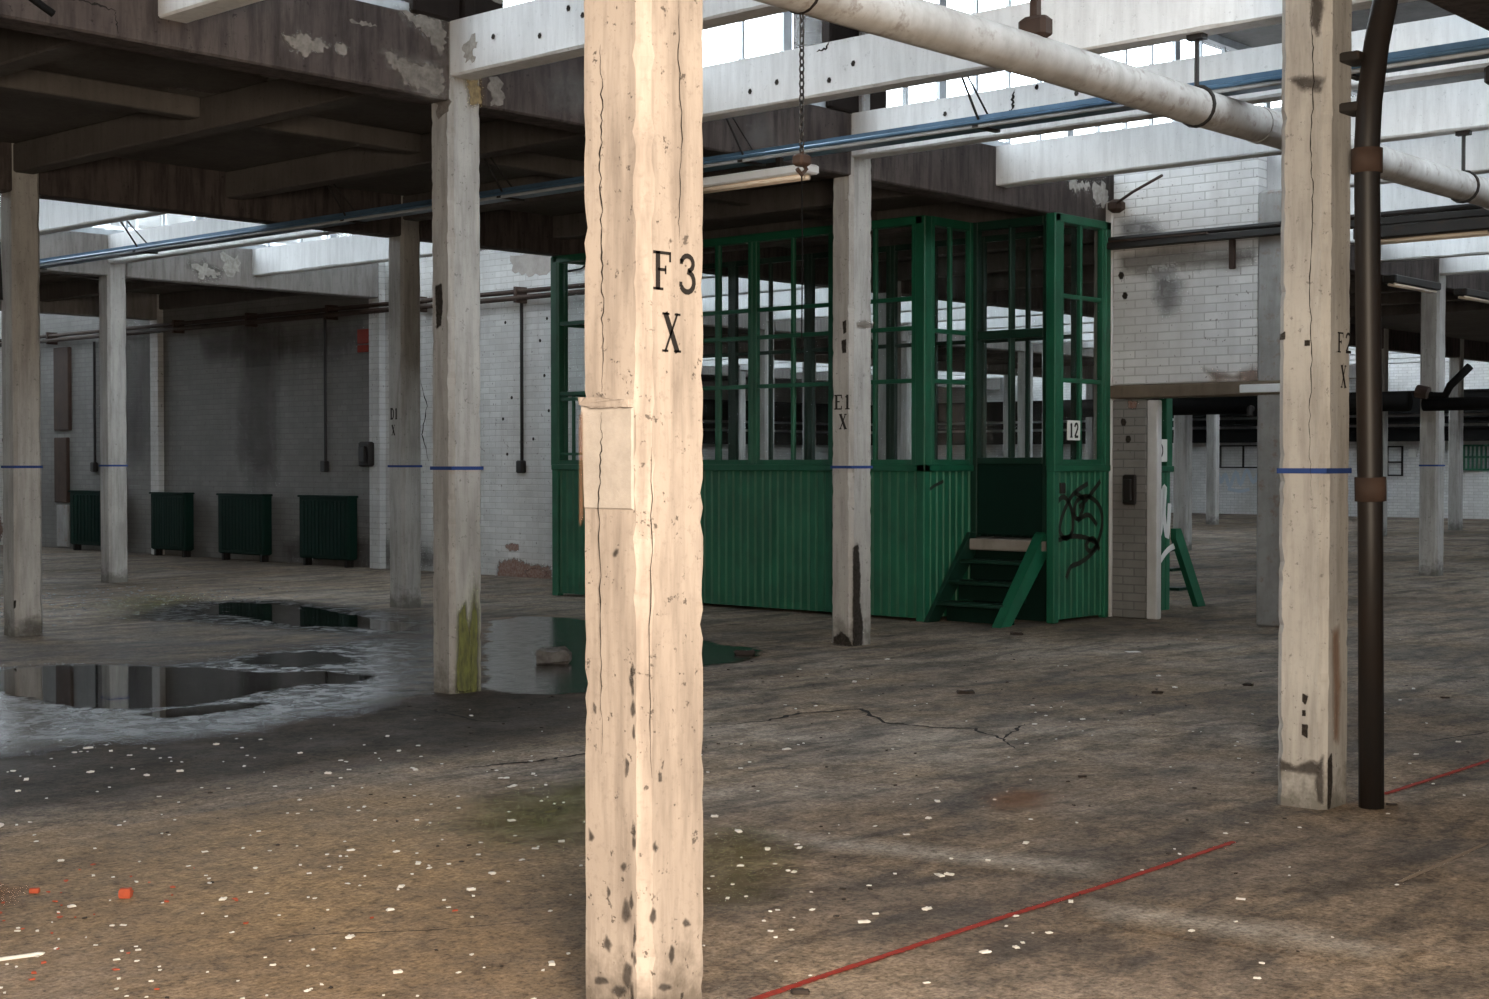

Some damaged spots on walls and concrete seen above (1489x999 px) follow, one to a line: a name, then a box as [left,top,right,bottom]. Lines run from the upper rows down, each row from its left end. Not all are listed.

peeling [283,32,347,57]
peeling [383,10,495,119]
leakage [0,592,587,838]
crack [723,709,1025,748]